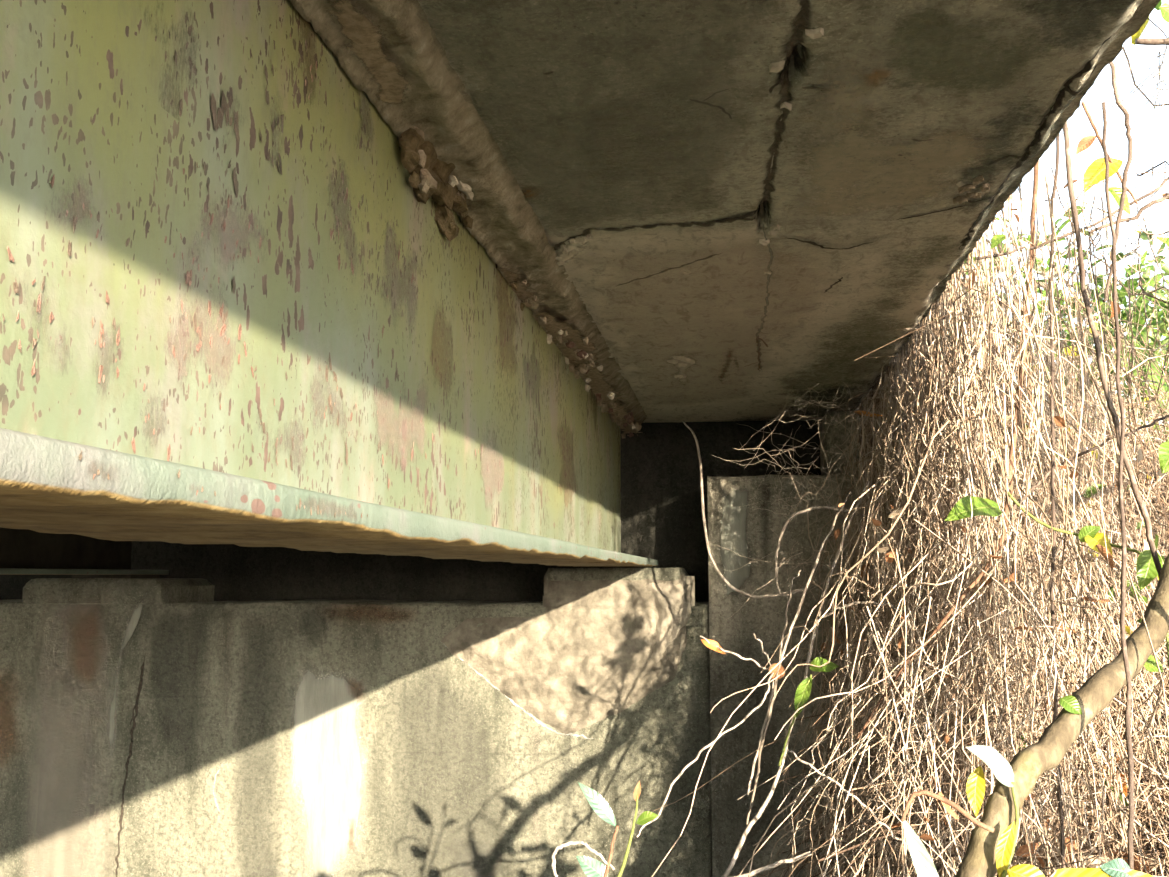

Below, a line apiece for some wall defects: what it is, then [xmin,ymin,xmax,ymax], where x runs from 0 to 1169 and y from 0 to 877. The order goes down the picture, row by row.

peeling [201,90,262,263]
spalling [327,0,409,161]
peeling [448,175,474,201]
crack [554,0,873,370]
crack [897,37,1111,250]
peeling [92,316,120,384]
peeling [164,233,257,378]
peeling [252,407,308,476]
peeling [309,352,357,465]
leakage [30,591,148,877]
crack [115,652,146,877]
leakage [291,667,366,877]